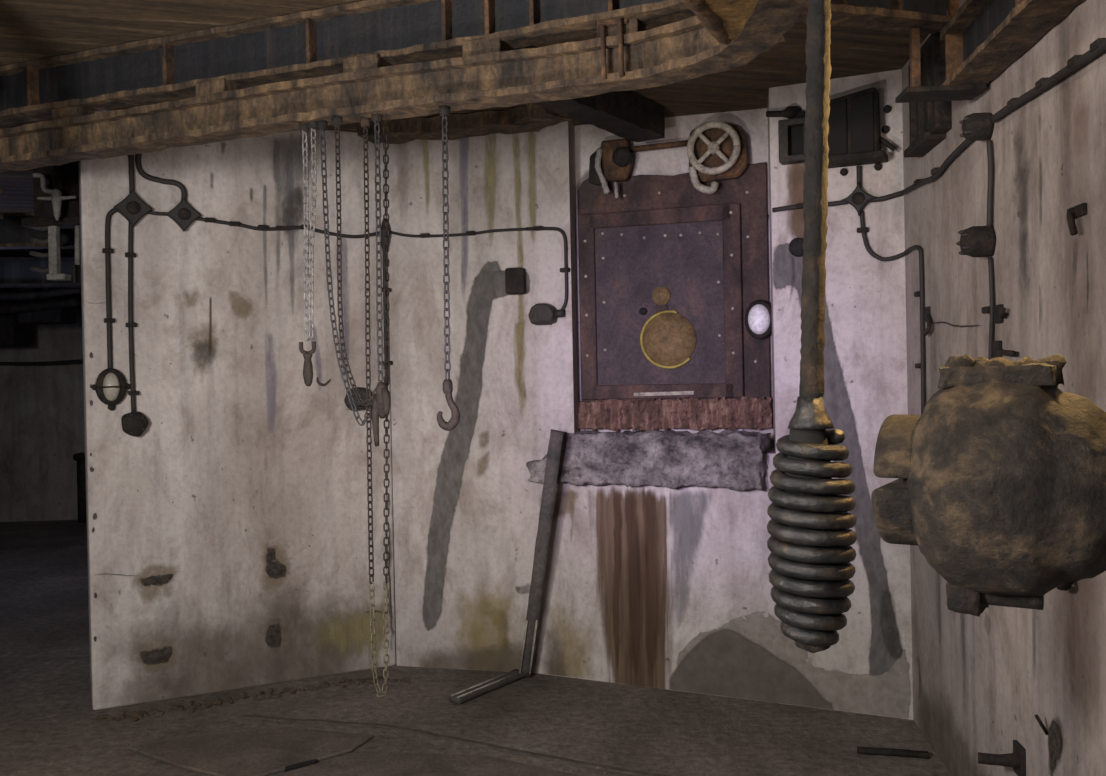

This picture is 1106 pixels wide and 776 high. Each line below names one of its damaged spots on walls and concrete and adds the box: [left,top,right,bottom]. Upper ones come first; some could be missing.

water stain [251,138,311,291]
peeling [773,243,803,305]
water stain [196,298,214,361]
peeling [670,295,910,719]
spalling [137,567,174,597]
spalling [266,548,286,584]
rust [596,488,668,689]
spalling [138,639,173,668]